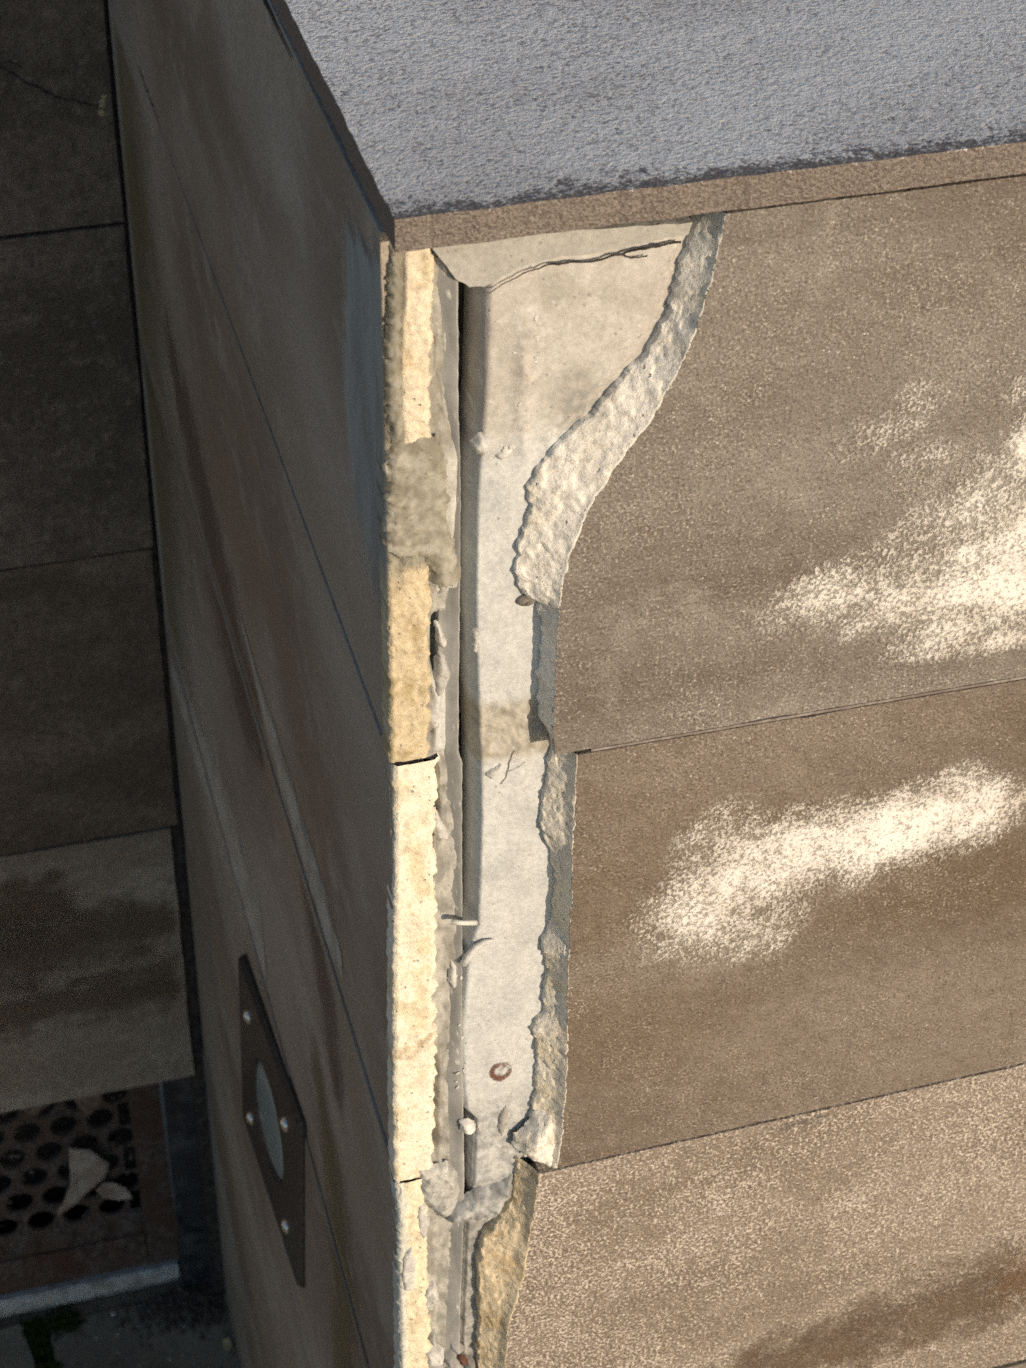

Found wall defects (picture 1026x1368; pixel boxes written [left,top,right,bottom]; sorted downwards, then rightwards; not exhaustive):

crack [0,61,99,107]
leakage [770,378,1026,662]
spalling [375,211,726,1368]
leakage [631,767,1026,961]